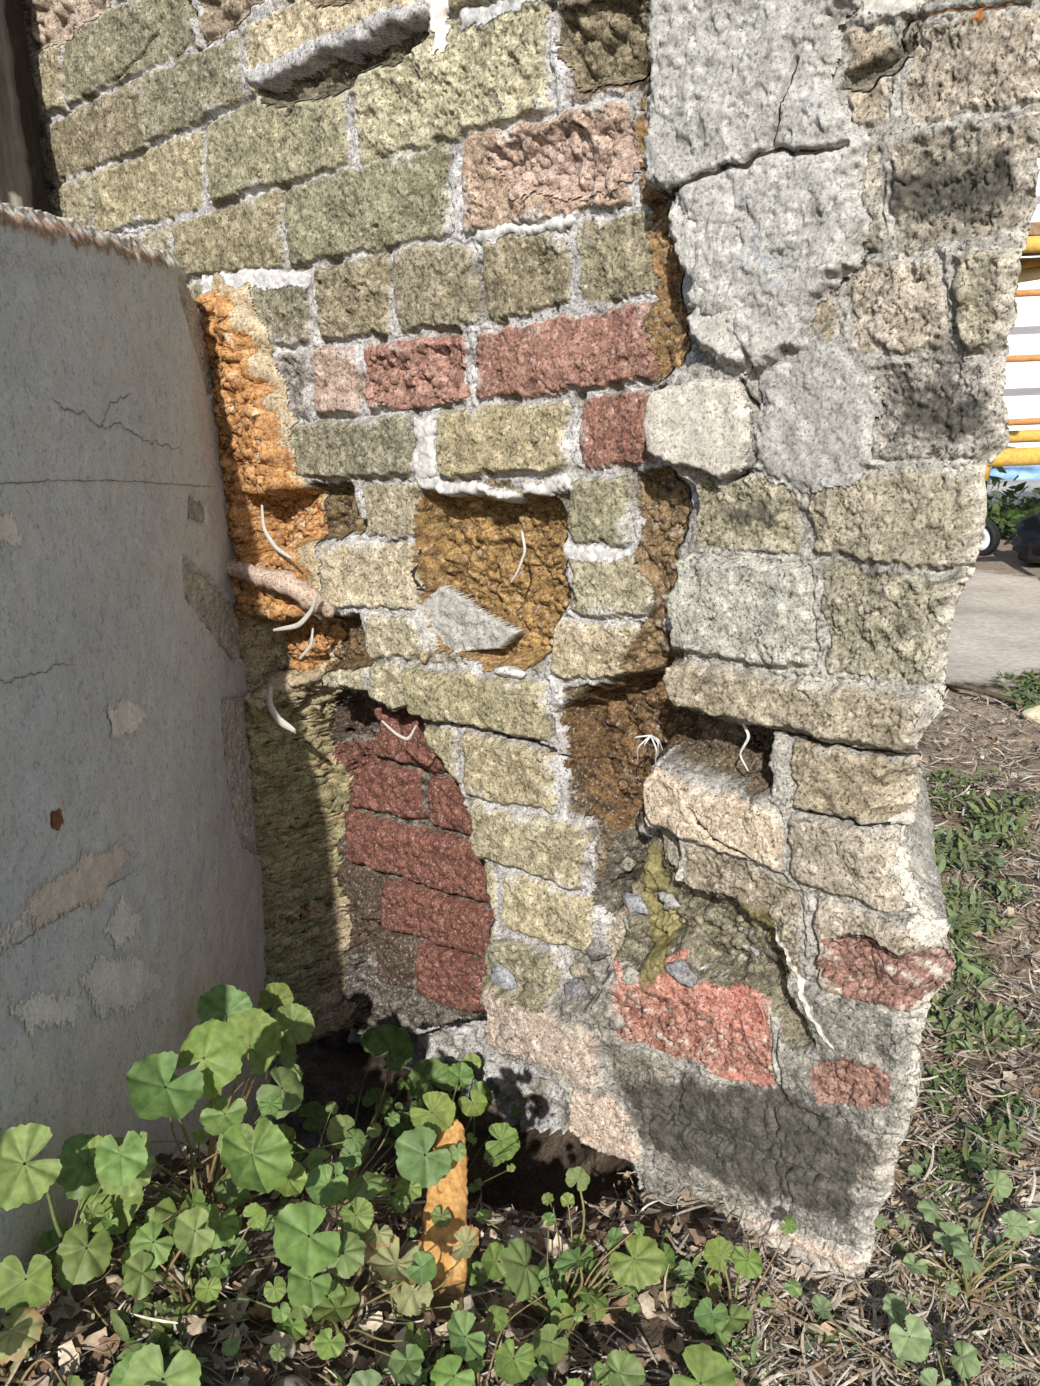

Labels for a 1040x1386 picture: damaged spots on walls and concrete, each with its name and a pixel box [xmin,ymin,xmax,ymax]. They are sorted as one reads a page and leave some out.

crack [653,62,848,201]
crack [53,393,183,450]
crack [0,479,212,487]
peeling [261,505,293,560]
crack [0,663,74,684]
spalling [182,560,246,659]
peeling [273,592,318,659]
spalling [412,490,571,679]
rust [51,808,64,831]
spalling [221,695,282,864]
spalling [266,616,496,1039]
spalling [555,656,775,832]